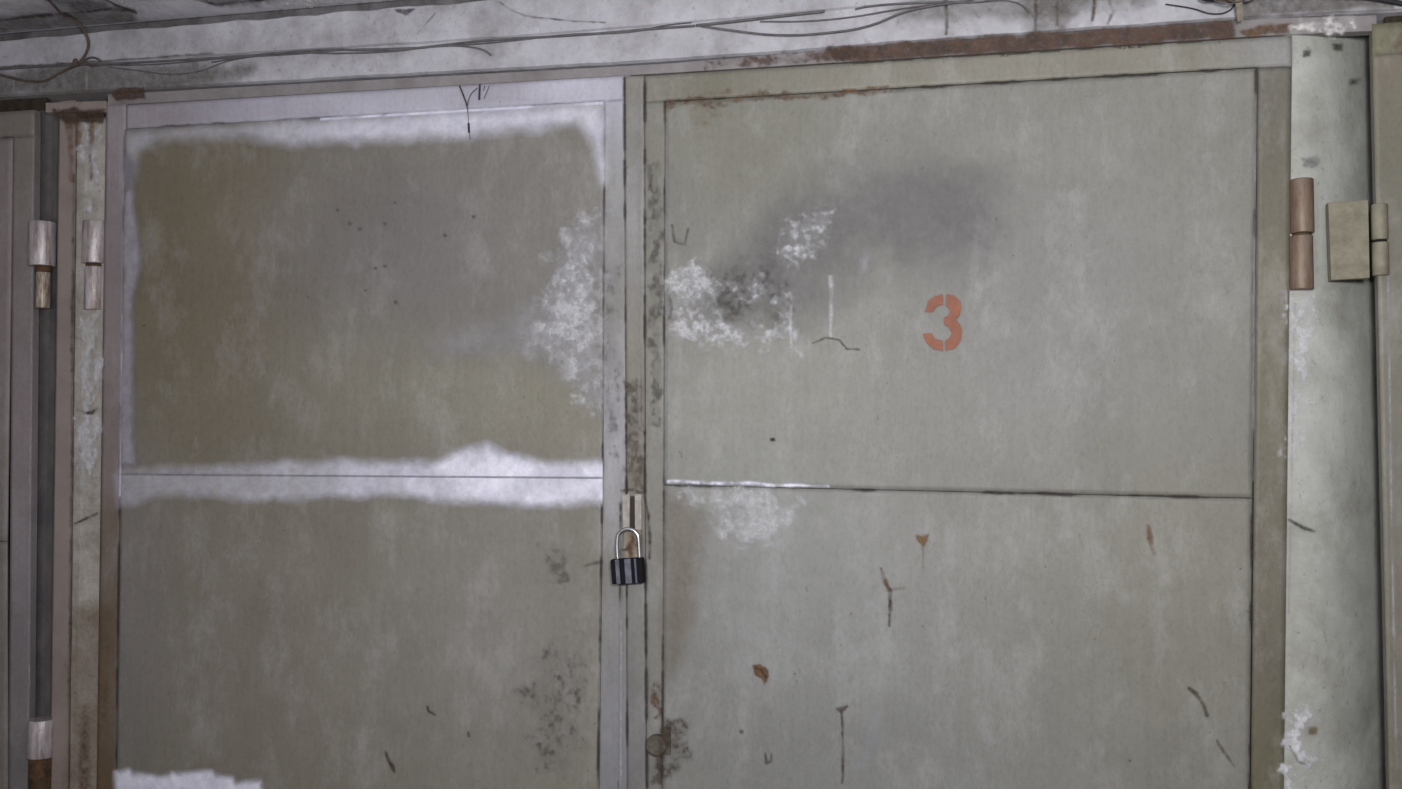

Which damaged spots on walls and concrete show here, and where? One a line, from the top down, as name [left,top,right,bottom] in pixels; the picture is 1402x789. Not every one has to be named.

corrosion [742,56,777,66]
corrosion [809,17,1356,61]
corrosion [651,693,688,783]